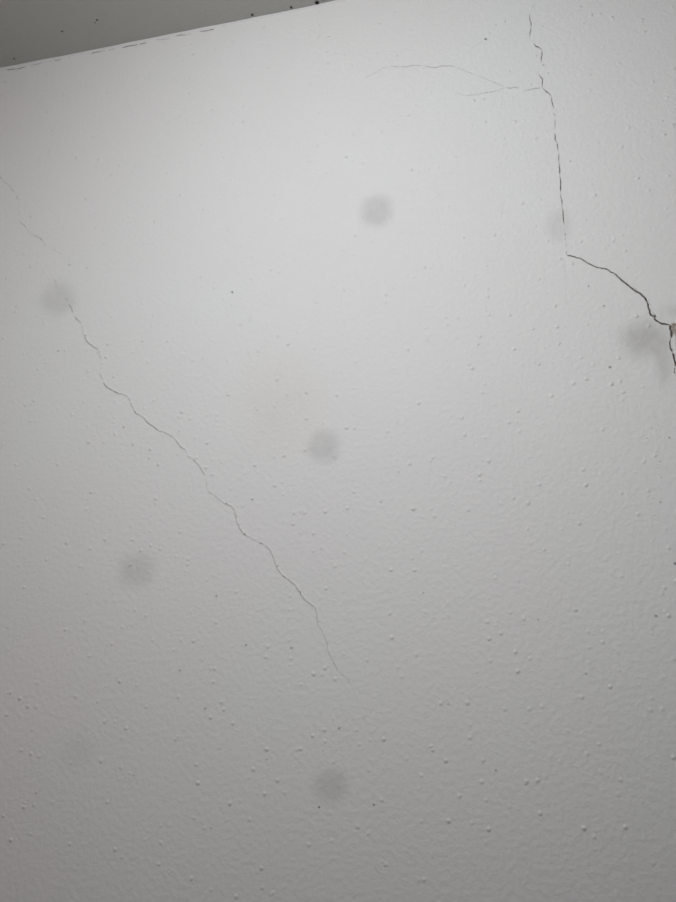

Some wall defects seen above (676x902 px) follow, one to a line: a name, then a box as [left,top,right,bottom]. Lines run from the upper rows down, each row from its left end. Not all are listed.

crack [567,252,676,373]